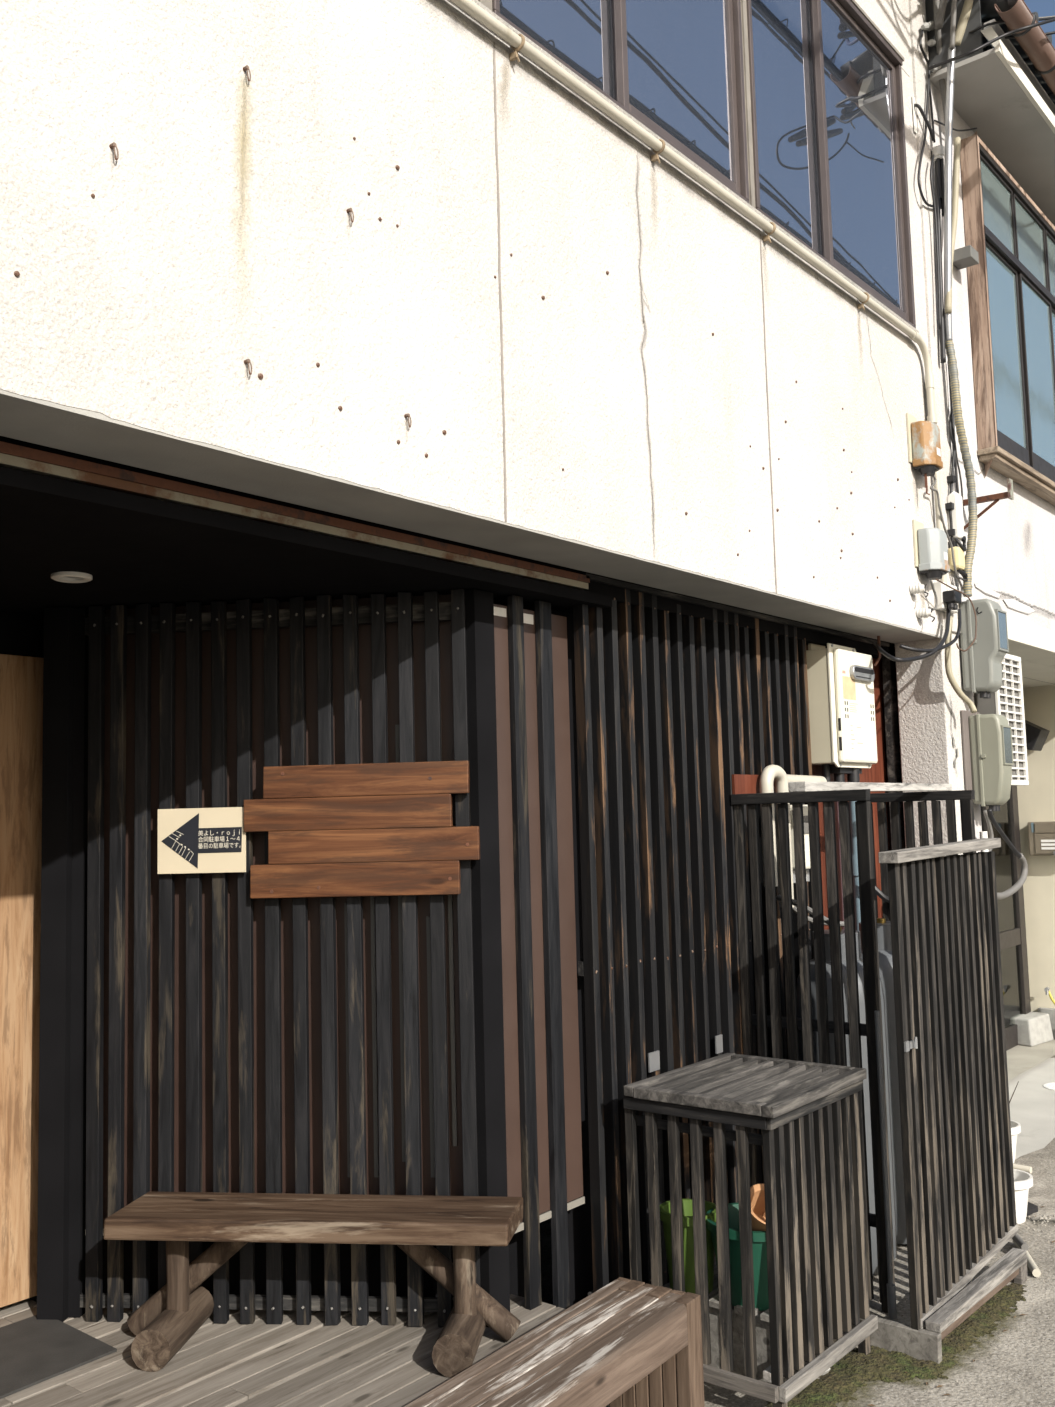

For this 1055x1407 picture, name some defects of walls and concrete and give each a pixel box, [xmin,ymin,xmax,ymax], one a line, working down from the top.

crack [637,158,655,558]